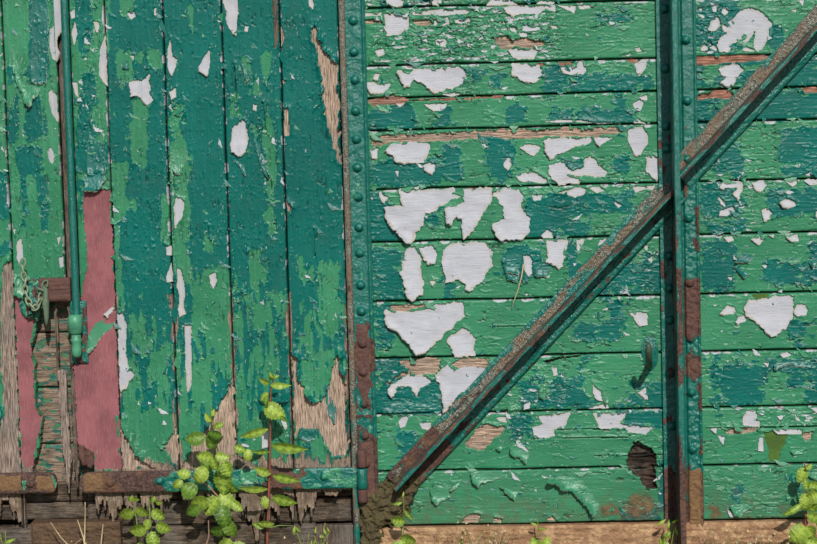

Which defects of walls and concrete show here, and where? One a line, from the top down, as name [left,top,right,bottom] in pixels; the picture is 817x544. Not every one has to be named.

peeling [696,0,817,128]
peeling [0,0,350,491]
corrosion [355,324,371,400]
peeling [365,0,659,470]
peeling [415,245,663,517]
corrosion [684,278,699,341]
peeling [699,94,817,518]
corrosion [359,441,375,502]
peeling [462,513,481,523]
corrosion [686,468,704,544]